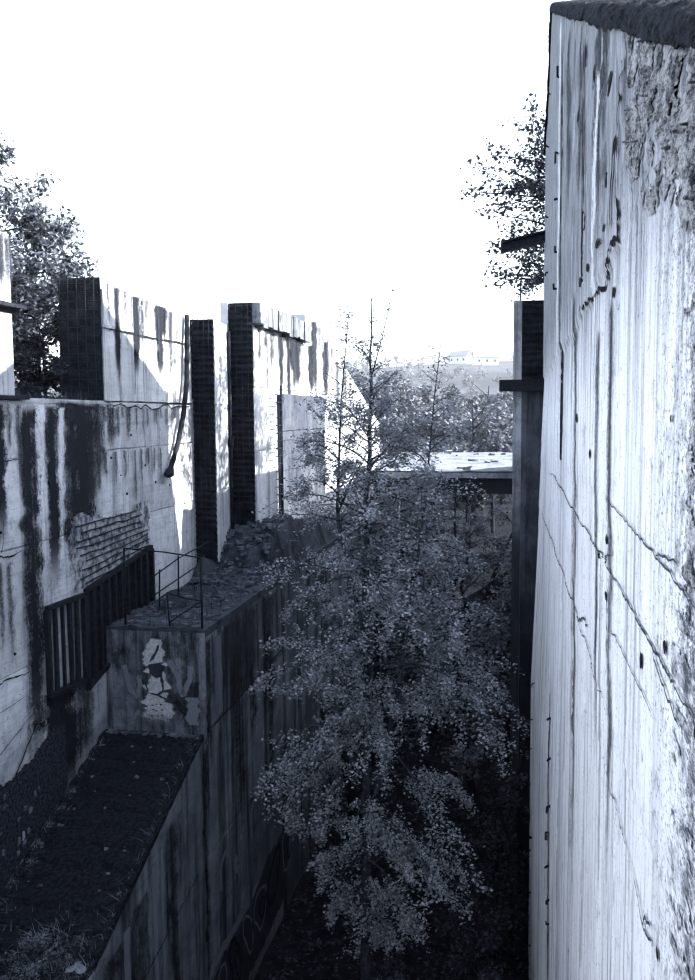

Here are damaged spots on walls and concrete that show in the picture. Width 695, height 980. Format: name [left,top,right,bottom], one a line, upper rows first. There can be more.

spalling [622,35,695,237]
leakage [0,233,13,285]
leakage [106,282,180,377]
leakage [258,320,352,406]
crack [542,44,695,729]
crack [0,520,22,559]
leakage [0,402,176,778]
spalling [68,500,151,595]
crack [0,672,37,781]
leakage [202,589,279,975]
leakage [103,812,182,980]